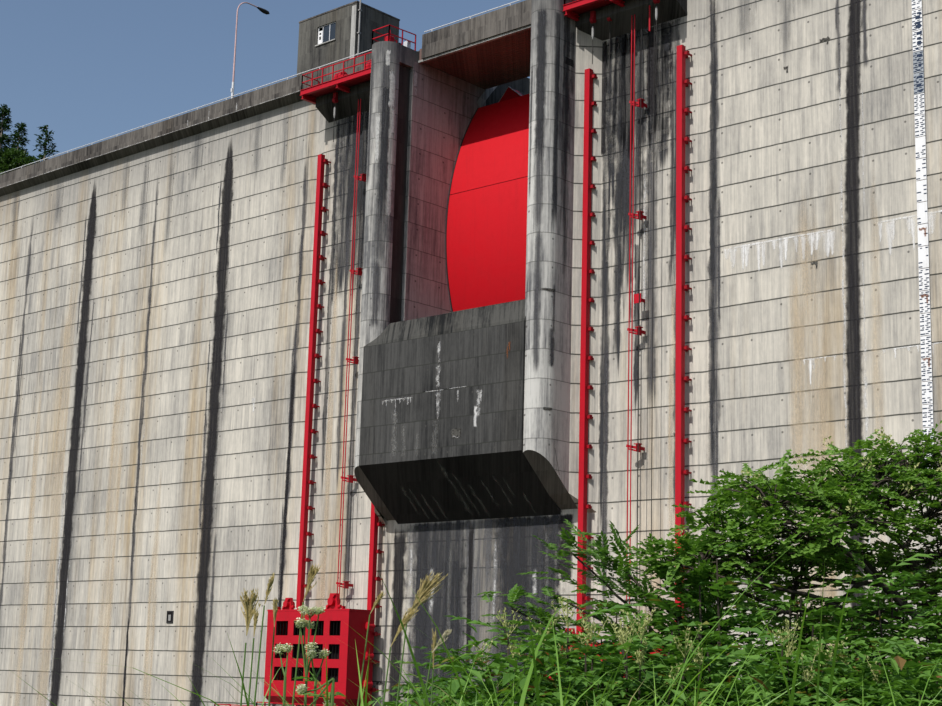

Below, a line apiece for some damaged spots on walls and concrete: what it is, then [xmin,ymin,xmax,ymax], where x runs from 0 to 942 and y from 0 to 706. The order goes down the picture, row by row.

damp [48,188,96,706]
damp [190,144,233,706]
damp [322,58,390,577]
damp [599,19,680,547]
damp [707,0,868,506]